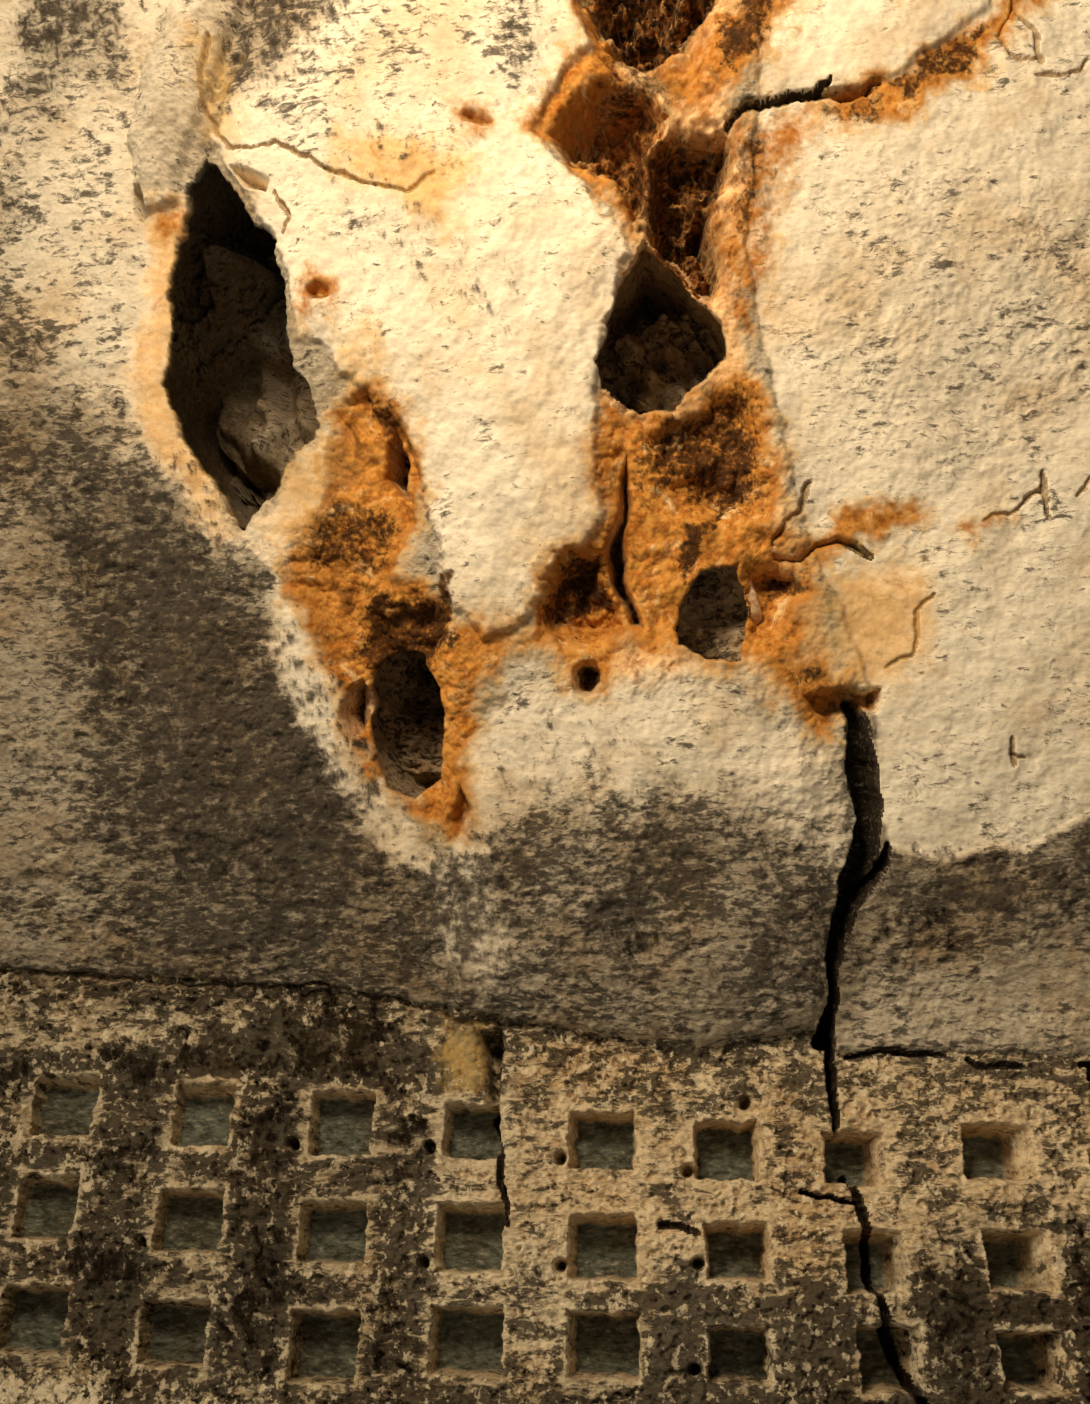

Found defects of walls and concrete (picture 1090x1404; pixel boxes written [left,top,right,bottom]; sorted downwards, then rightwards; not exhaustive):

water stain [10,0,126,116]
water stain [214,0,358,115]
water stain [497,0,556,92]
rust [516,0,1049,335]
rust [274,369,931,855]
rust [957,514,1018,547]
water stain [31,450,743,1018]
water stain [672,839,836,1019]
crack [810,697,1026,1132]
crack [1078,1061,1090,1081]
crack [494,1115,510,1227]
crack [798,1175,930,1404]